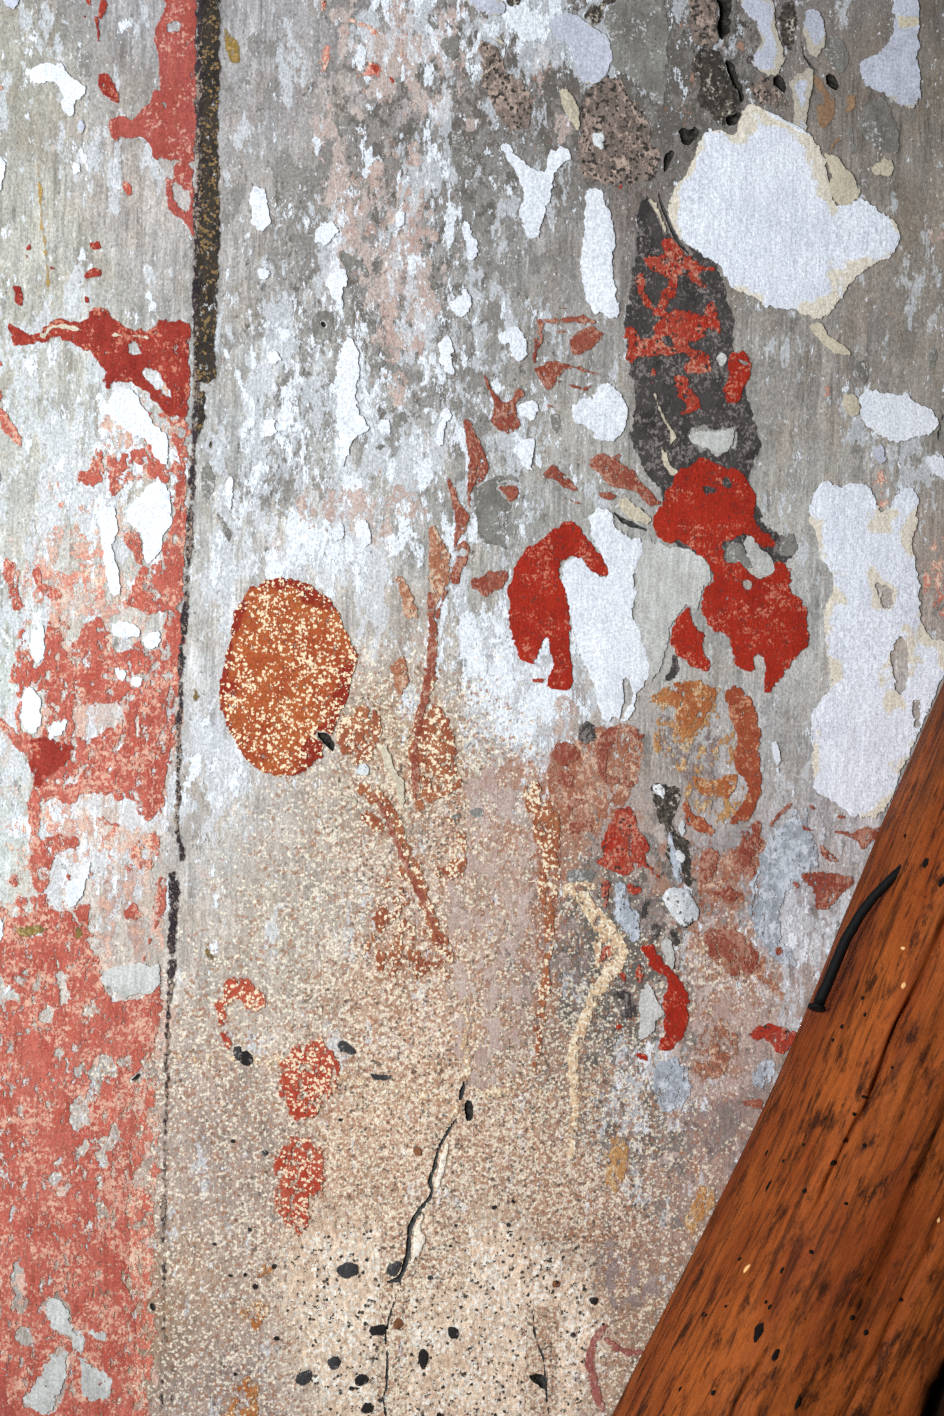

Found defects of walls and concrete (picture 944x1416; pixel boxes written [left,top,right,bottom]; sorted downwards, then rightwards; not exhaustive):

peeling [467,0,521,16]
spalling [549,0,700,187]
spalling [688,0,839,130]
peeling [846,0,921,154]
peeling [649,199,666,232]
peeling [84,268,101,279]
peeling [257,268,270,280]
peeling [13,286,23,306]
peeling [689,429,734,453]
peeling [661,450,678,476]
peeling [0,296,233,1416]
crack [381,1081,465,1416]